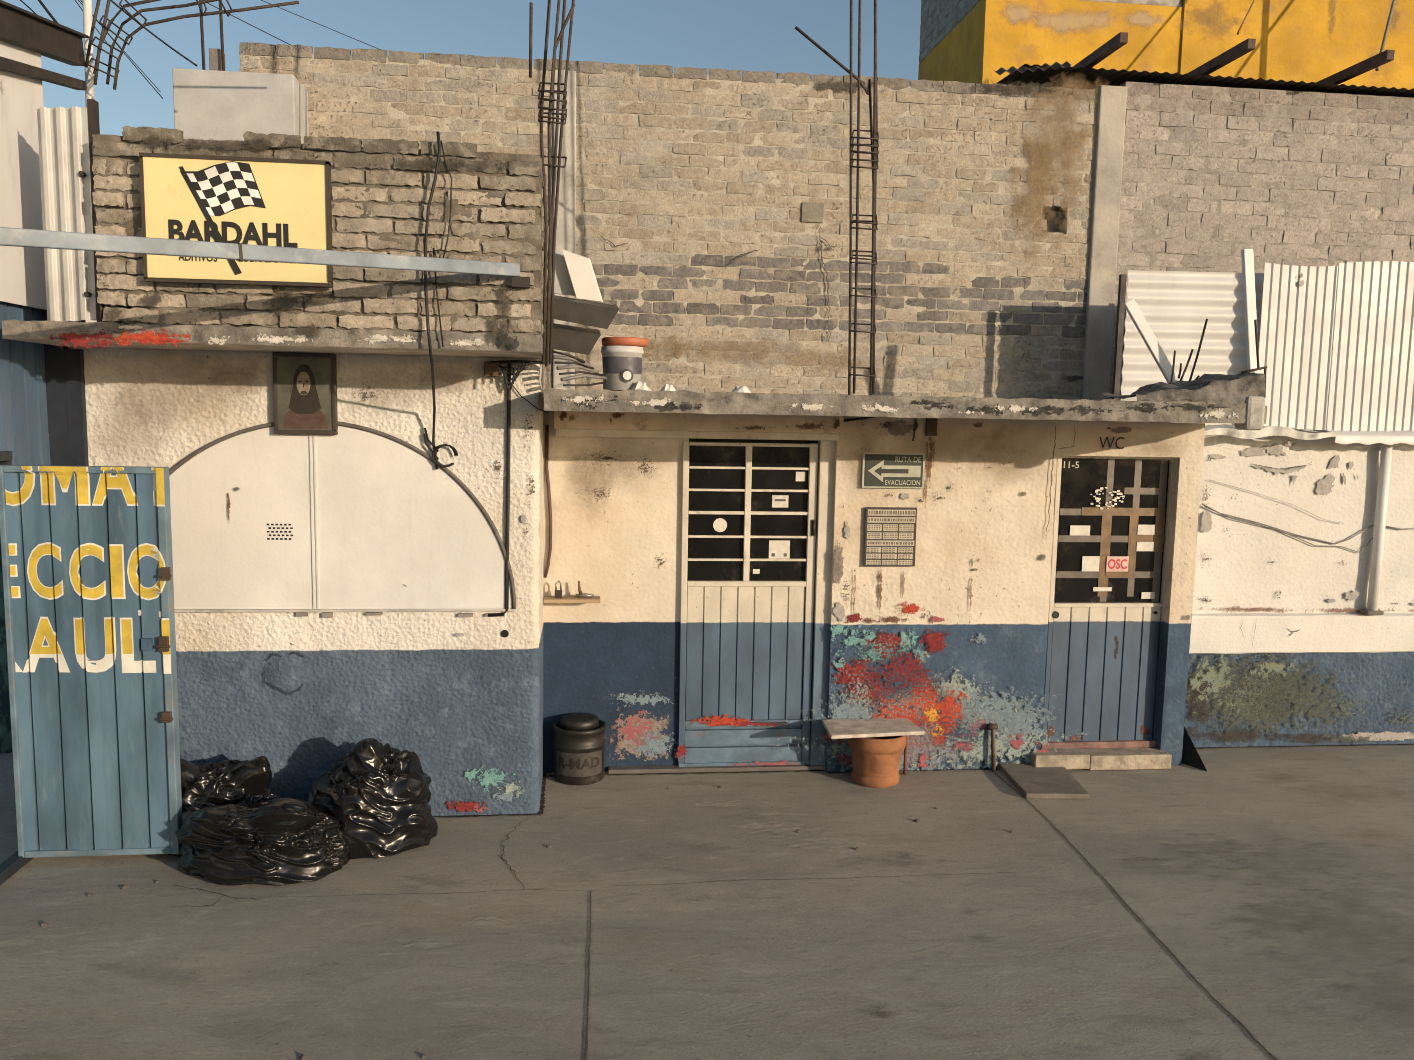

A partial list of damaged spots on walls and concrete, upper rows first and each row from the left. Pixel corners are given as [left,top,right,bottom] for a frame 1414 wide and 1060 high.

peeling [584,446,656,477]
peeling [691,503,1095,773]
flaking render [605,690,689,761]
crack [604,768,851,776]
crack [173,885,256,907]
crack [312,772,792,1060]
crack [899,768,1277,1060]